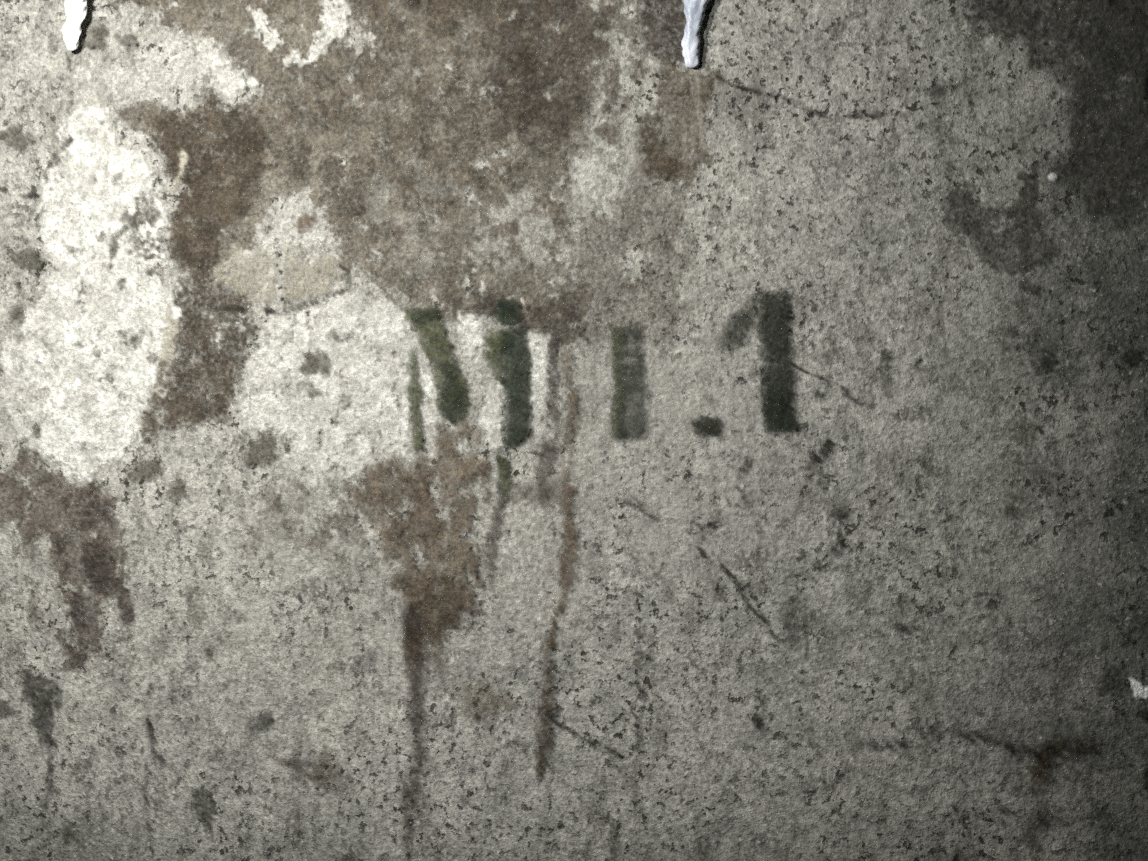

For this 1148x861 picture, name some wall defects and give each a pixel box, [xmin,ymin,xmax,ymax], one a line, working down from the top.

water stain [109,0,722,436]
water stain [19,665,61,747]
water stain [0,448,134,670]
corrosion [346,421,512,846]
corrosion [526,338,578,777]